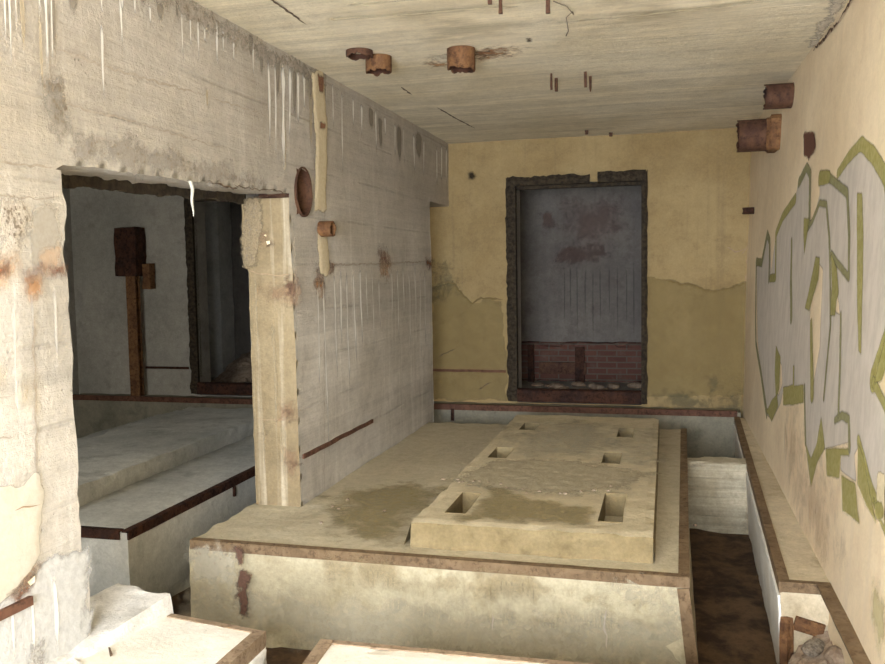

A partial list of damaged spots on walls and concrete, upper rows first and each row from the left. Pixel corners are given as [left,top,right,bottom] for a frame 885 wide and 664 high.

leakage [3,0,16,47]
leakage [39,0,56,56]
leakage [119,0,163,38]
leakage [176,2,235,58]
crack [271,0,305,24]
leakage [249,36,312,155]
leakage [324,85,424,167]
rust [25,247,65,296]
peeling [0,472,93,664]
rust [234,546,252,617]